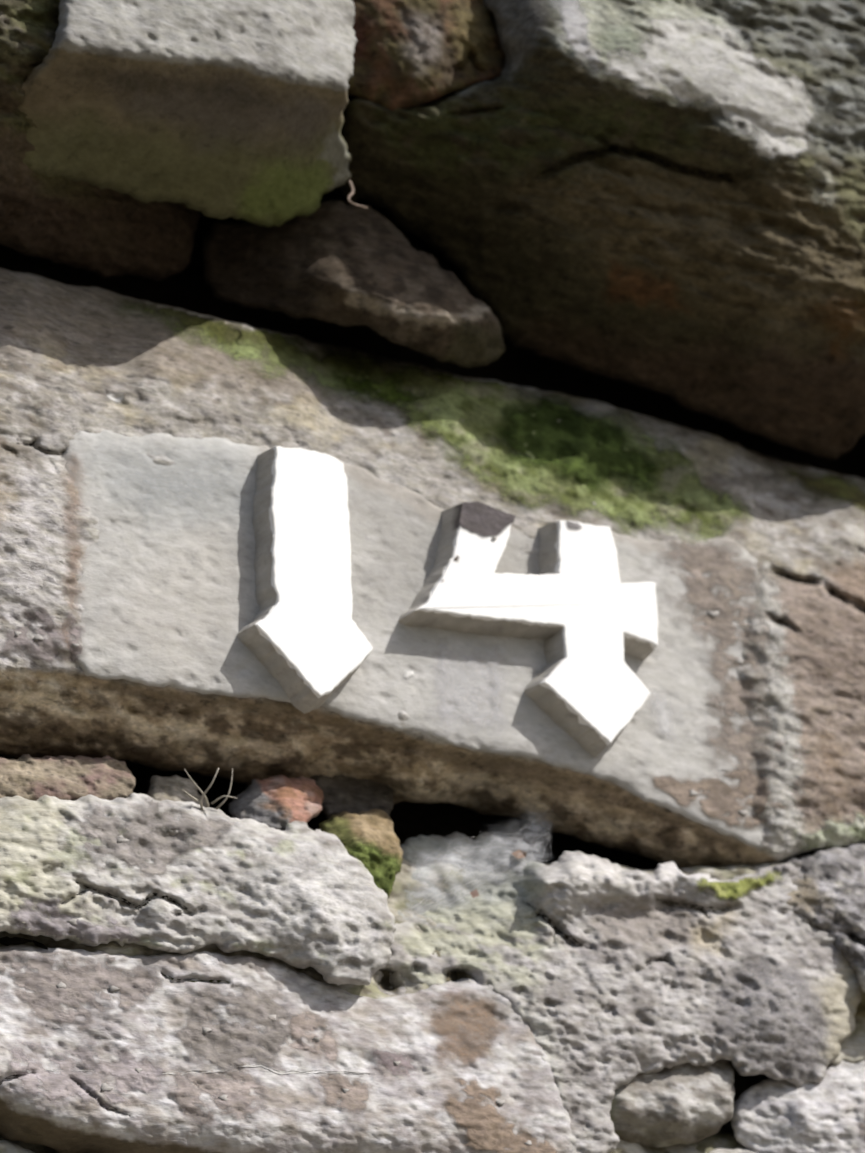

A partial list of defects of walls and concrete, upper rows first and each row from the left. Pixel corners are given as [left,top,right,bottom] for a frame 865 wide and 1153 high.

crack [771,570,865,613]
crack [739,615,797,631]